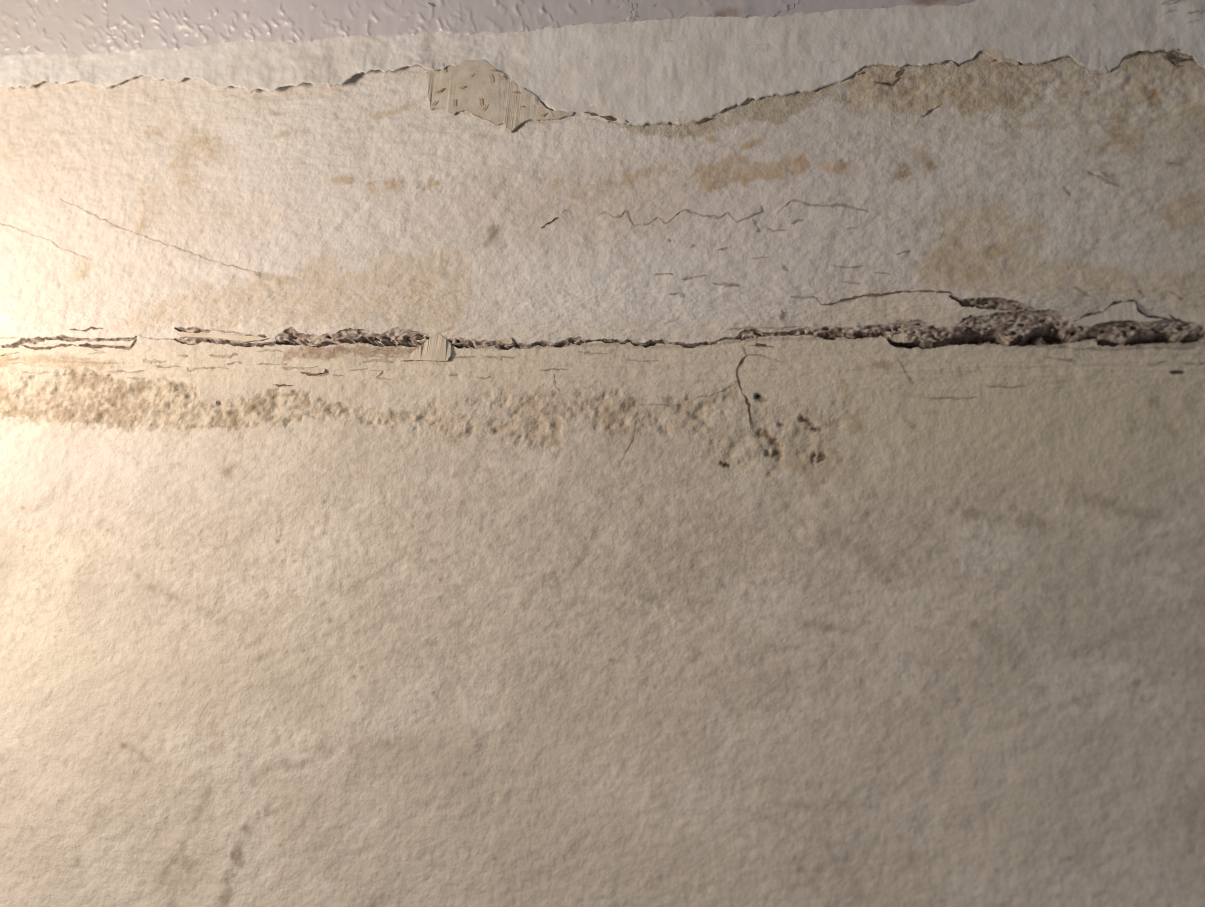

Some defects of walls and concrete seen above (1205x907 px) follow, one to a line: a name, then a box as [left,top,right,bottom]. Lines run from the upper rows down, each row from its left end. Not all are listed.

peeling [0,0,1205,140]
crack [1062,170,1119,196]
crack [0,188,1205,466]
leakage [741,358,921,495]